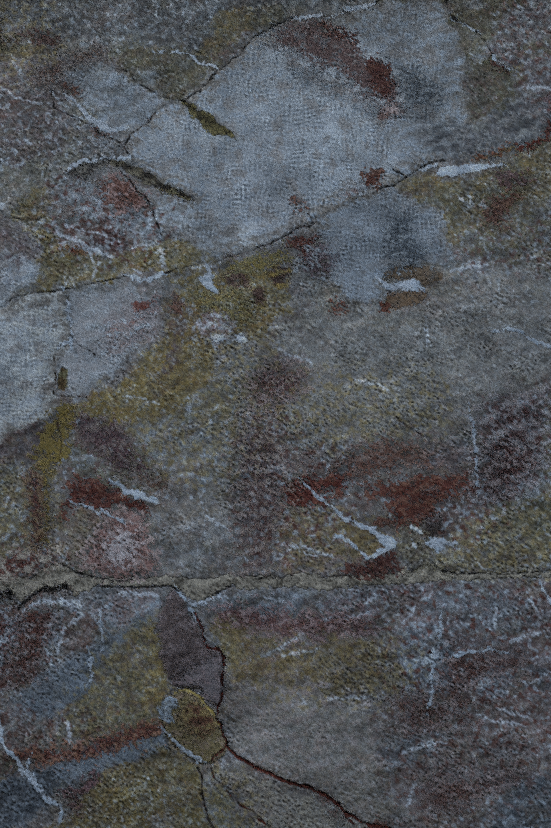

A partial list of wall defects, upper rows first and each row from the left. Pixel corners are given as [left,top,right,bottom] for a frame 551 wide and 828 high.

crack [50,17,294,236]
crack [379,159,446,189]
crack [252,213,324,251]
crack [9,276,130,301]
crack [0,565,180,611]
crack [435,566,547,575]
crack [193,612,390,828]